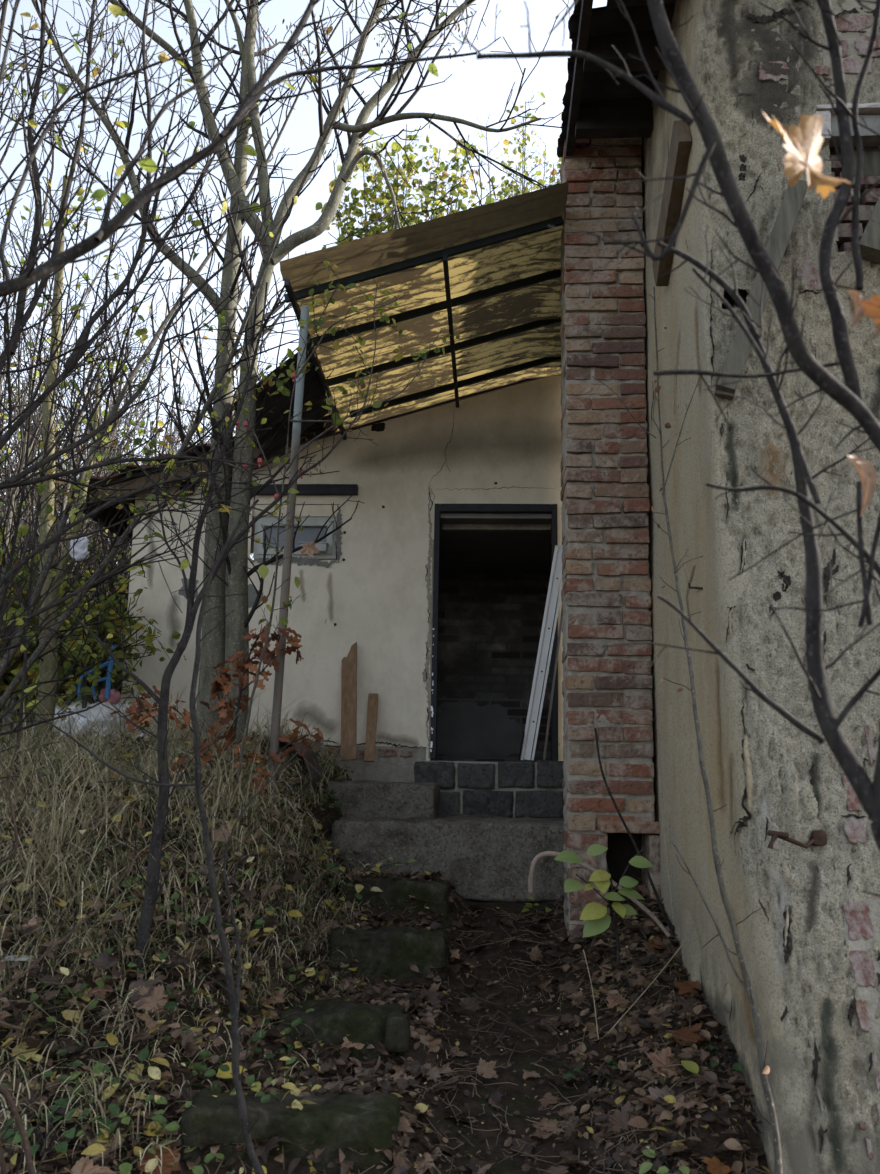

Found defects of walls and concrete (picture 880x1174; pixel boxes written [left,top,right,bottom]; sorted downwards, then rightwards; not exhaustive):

flaking render [755,61,789,82]
flaking render [814,0,880,86]
flaking render [842,898,880,1159]